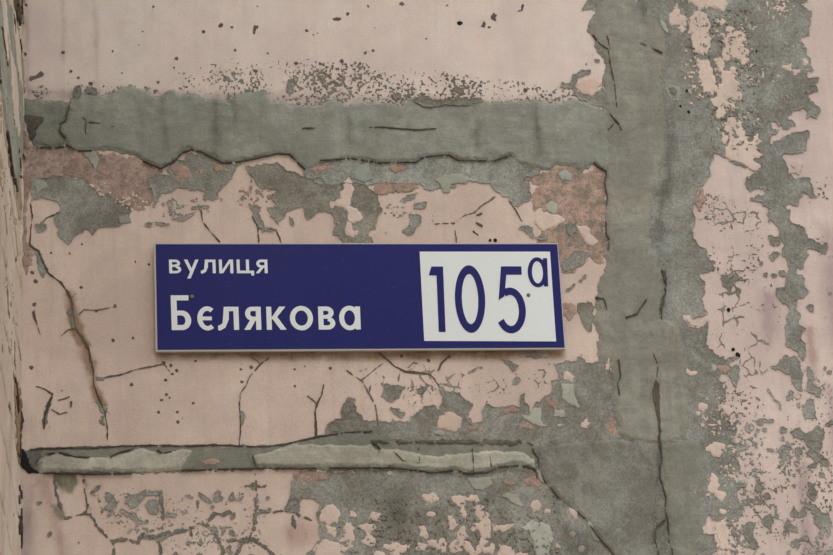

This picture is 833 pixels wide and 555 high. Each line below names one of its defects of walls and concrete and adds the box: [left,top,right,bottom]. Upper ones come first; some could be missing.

crack [143,149,512,169]
crack [369,124,437,132]
peeling [0,0,608,474]
crack [625,269,667,319]
peeling [637,0,833,555]
crack [29,196,560,555]
crack [615,359,623,395]
peeling [284,351,671,555]
crack [652,353,673,555]
peeling [90,482,272,555]
crack [577,511,614,554]